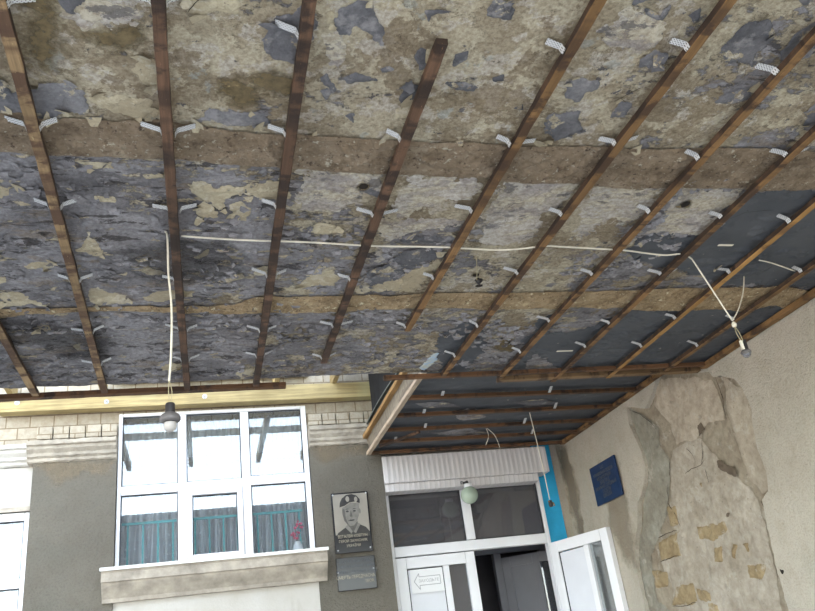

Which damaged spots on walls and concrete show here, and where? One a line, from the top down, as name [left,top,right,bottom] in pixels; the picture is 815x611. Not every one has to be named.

peeling [58,0,144,32]
peeling [180,0,240,24]
peeling [258,6,301,64]
peeling [312,0,385,100]
peeling [596,0,671,73]
peeling [719,19,781,67]
water stain [217,70,293,108]
spalling [0,80,41,199]
spalling [31,56,163,215]
spalling [173,108,284,168]
peeling [479,77,609,246]
flaking render [0,131,815,611]